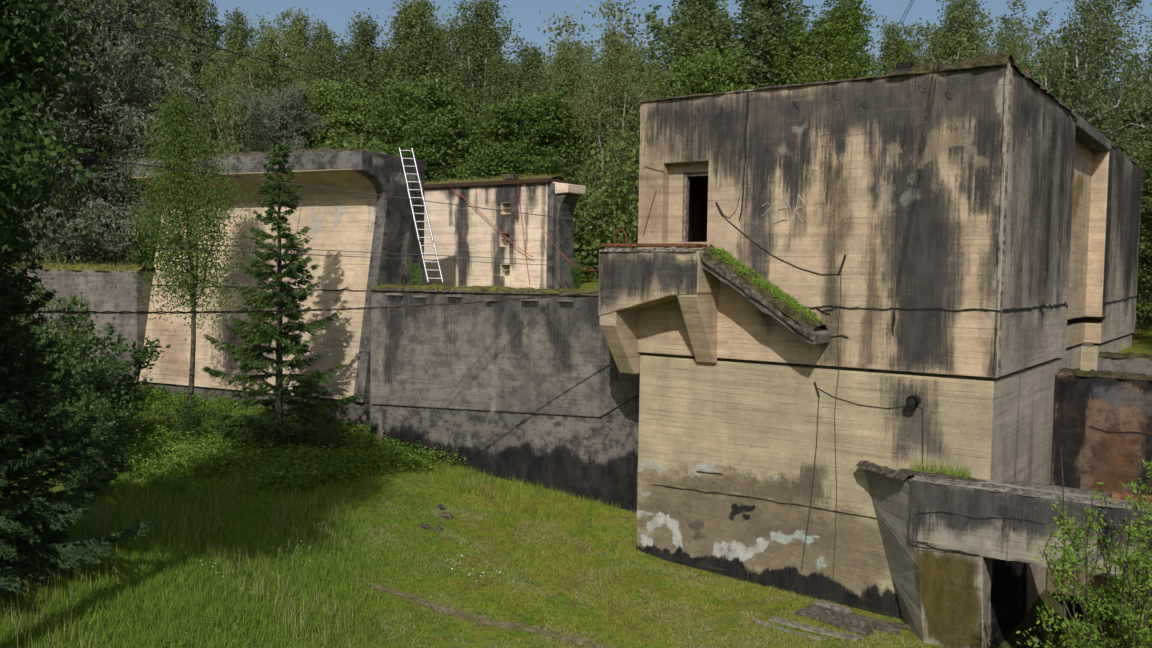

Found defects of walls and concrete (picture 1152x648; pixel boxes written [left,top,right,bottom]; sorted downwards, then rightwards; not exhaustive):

leakage [385,298,402,383]
leakage [450,187,470,287]
leakage [493,185,529,363]
leakage [541,306,573,371]
leakage [587,252,698,327]
leakage [651,64,1074,458]
leakage [1103,146,1143,321]
leakage [637,466,884,592]
leakage [909,374,1152,559]